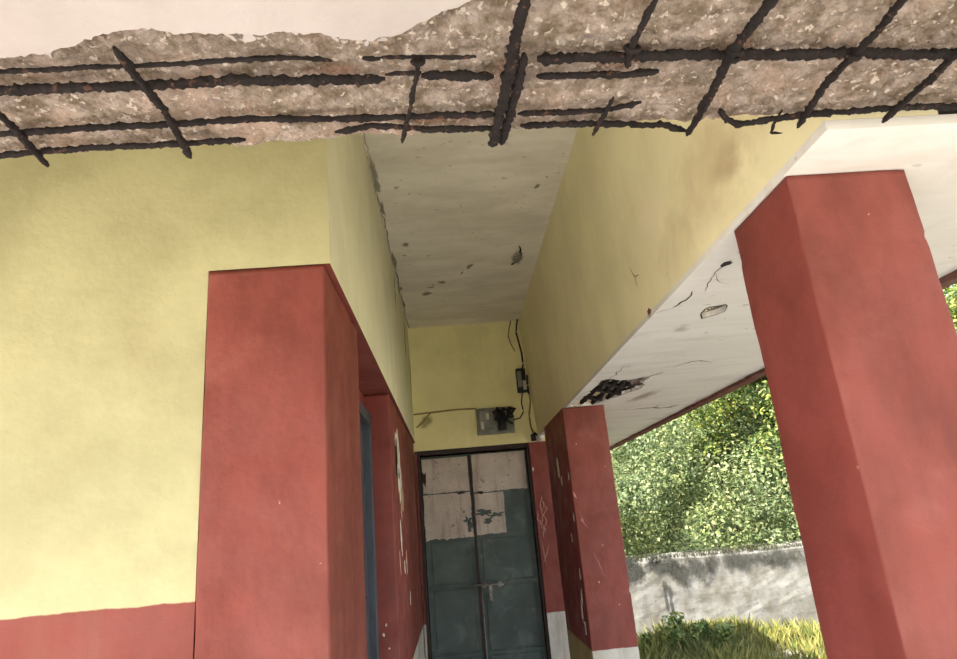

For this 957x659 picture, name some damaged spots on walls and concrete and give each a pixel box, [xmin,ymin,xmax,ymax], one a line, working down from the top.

spalling [0,0,957,167]
crack [657,261,733,313]
spalling [573,365,663,406]